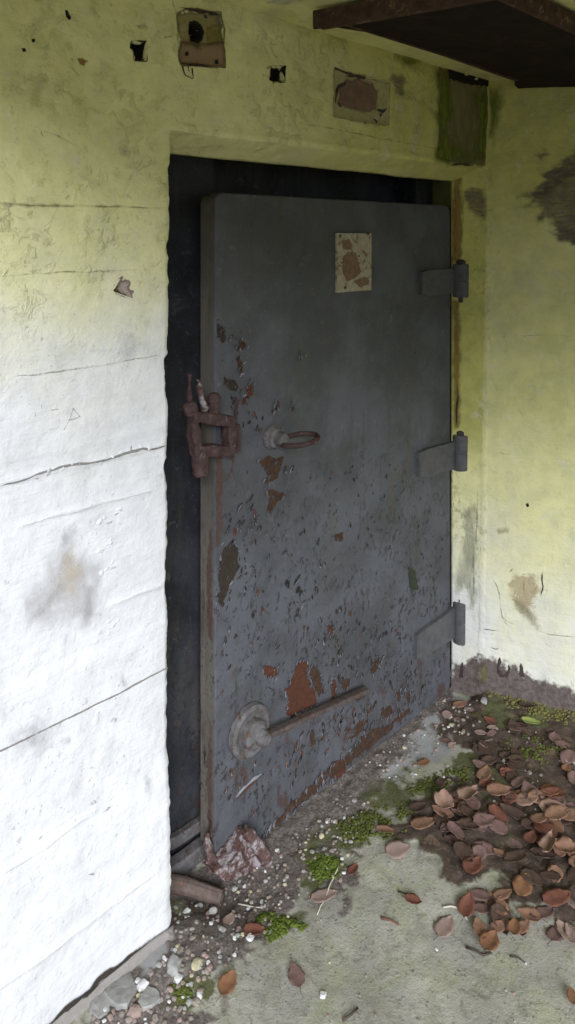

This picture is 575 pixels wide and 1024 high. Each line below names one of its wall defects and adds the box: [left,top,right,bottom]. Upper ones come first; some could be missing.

spalling [333,67,390,125]
water stain [436,73,487,163]
water stain [527,156,575,244]
spalling [112,276,134,301]
peeling [224,377,264,433]
crack [2,444,167,486]
peeling [215,494,442,757]
crack [0,667,168,752]
corrosion [261,656,352,718]
water stain [449,655,575,711]
corrosion [262,688,415,840]